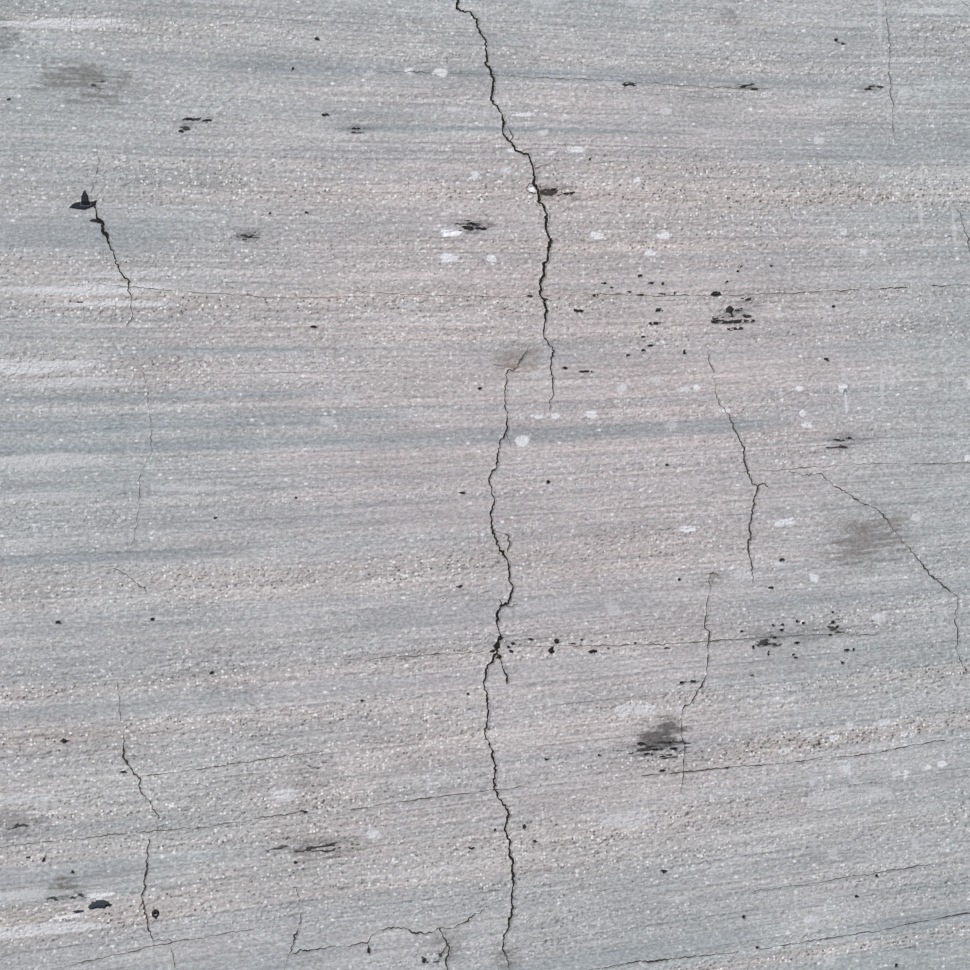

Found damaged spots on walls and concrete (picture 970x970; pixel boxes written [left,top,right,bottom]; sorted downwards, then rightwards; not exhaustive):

crack [91,145,133,326]
crack [456,0,558,968]
crack [708,354,768,582]
crack [789,471,967,671]
crack [284,887,482,970]